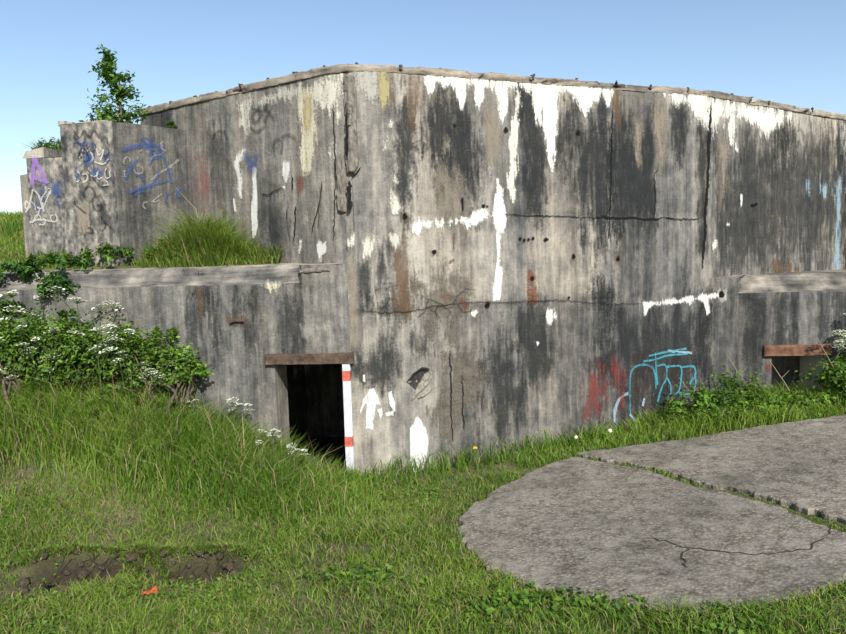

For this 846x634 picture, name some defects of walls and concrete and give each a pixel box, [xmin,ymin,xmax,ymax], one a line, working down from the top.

damp [282,161,290,189]
damp [238,73,344,176]
crack [261,100,361,241]
damp [316,241,327,260]
damp [351,337,399,396]
spalling [407,262,487,448]
damp [347,71,659,316]
damp [477,296,557,441]
damp [589,279,719,425]
damp [663,93,846,277]
damp [775,293,799,345]
crack [654,528,831,568]